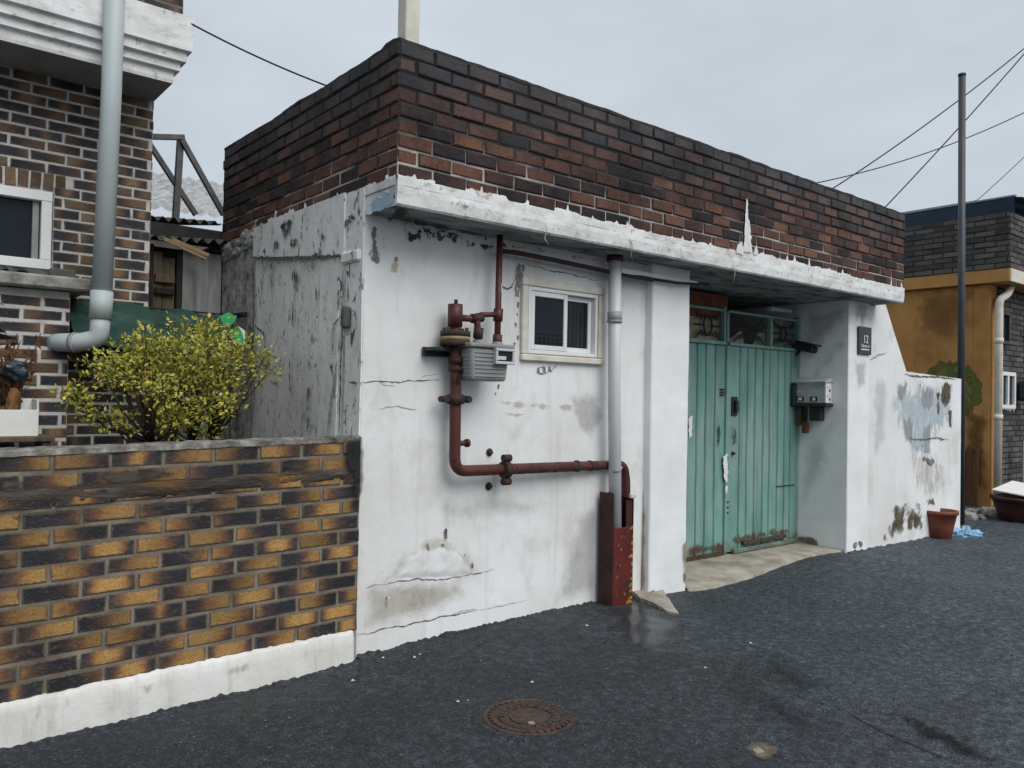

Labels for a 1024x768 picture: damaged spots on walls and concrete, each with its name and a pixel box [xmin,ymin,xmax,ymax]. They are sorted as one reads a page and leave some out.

peeling [273,219,297,251]
peeling [345,189,493,263]
crack [252,253,439,433]
peeling [894,382,952,465]
crack [367,553,491,588]
rust [683,529,787,581]
crack [358,600,525,635]